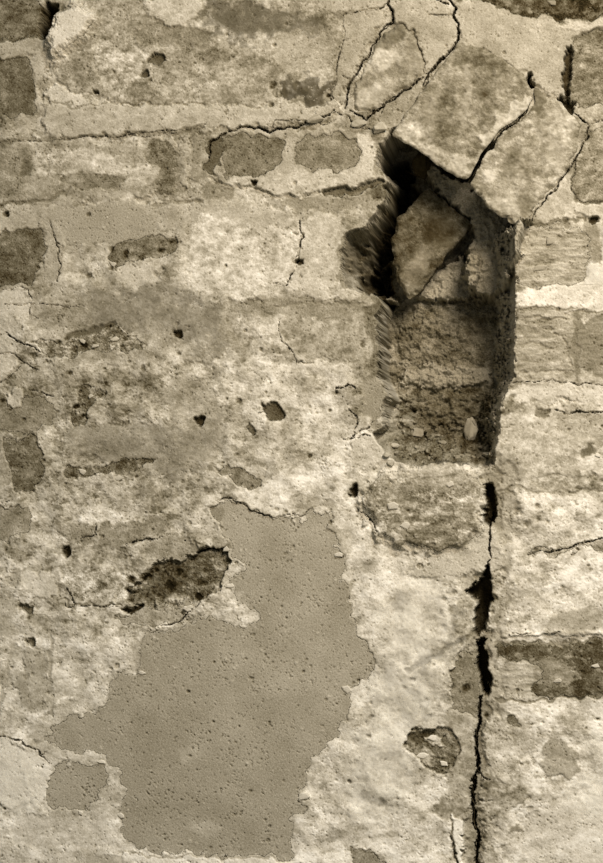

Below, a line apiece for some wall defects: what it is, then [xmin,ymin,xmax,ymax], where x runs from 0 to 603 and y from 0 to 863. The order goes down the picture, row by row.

crack [208,0,459,158]
crack [468,111,526,183]
crack [532,111,603,220]
spalling [340,144,591,469]
flaking render [44,500,376,862]
spalling [404,727,460,774]
crack [452,696,494,863]